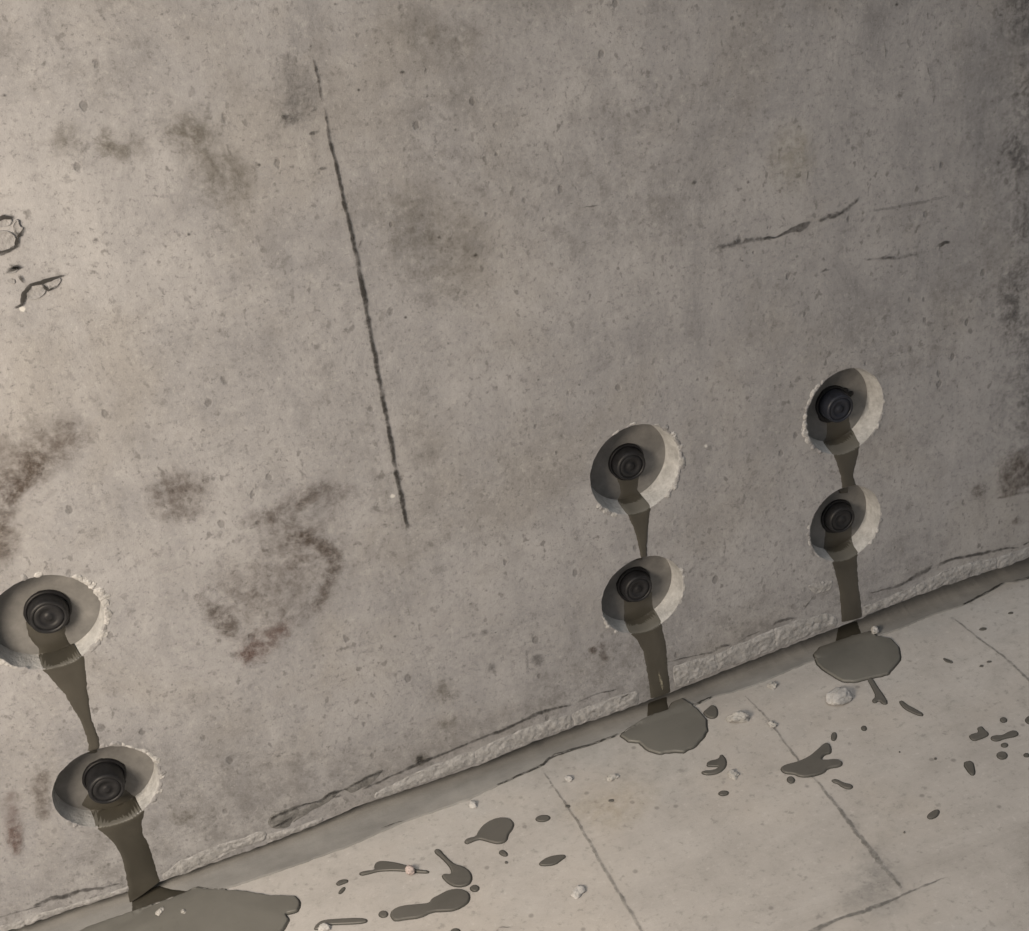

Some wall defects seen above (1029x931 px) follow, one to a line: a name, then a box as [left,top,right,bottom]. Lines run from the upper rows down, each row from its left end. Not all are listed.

peeling [0,215,62,308]
crack [722,200,858,248]
crack [311,116,408,526]
damp [823,417,860,493]
damp [617,477,651,560]
damp [824,525,878,641]
damp [26,622,100,754]